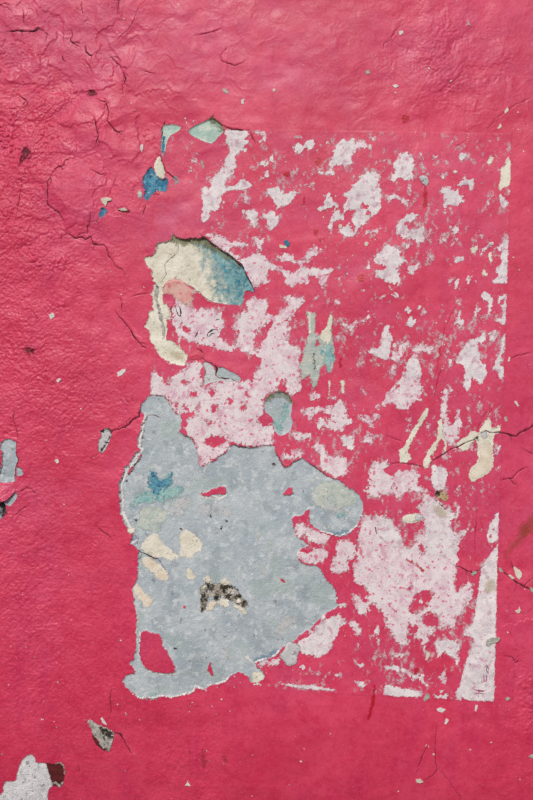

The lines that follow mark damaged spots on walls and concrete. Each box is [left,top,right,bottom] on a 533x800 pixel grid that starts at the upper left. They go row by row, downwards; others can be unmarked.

crack [0,0,47,41]
crack [62,0,156,146]
peeling [137,115,249,200]
crack [46,159,122,269]
peeling [144,234,254,386]
peeling [263,382,293,436]
peeling [0,439,23,519]
peeling [118,395,363,700]
peeling [402,513,424,523]
crack [390,425,533,484]
peeling [87,717,130,751]
peeling [0,755,65,800]